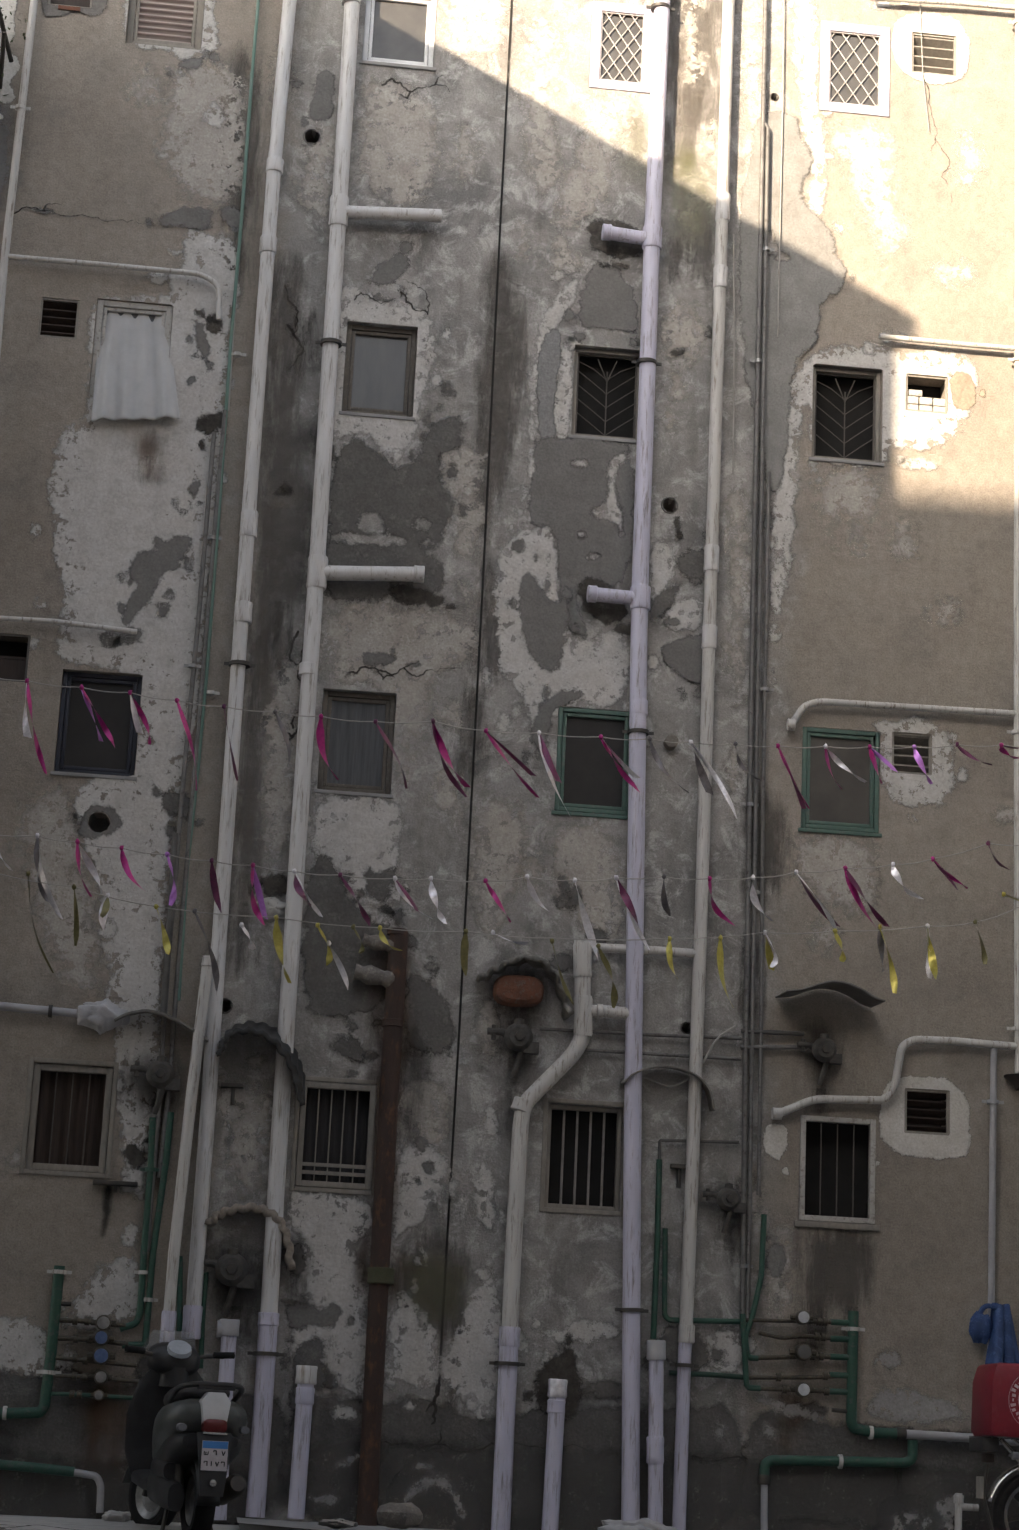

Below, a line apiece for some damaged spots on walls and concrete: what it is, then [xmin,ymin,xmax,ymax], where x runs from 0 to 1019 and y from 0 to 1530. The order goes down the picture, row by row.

crack [381,75,449,99]
crack [14,203,152,223]
crack [354,283,430,315]
flaking render [326,242,467,609]
flaking render [482,218,706,764]
peeling [763,332,986,643]
peeling [30,206,240,1200]
crack [348,661,446,680]
peeling [280,1191,373,1420]
damp [397,1236,469,1335]
peeling [384,1136,505,1419]
spalling [518,1317,620,1421]